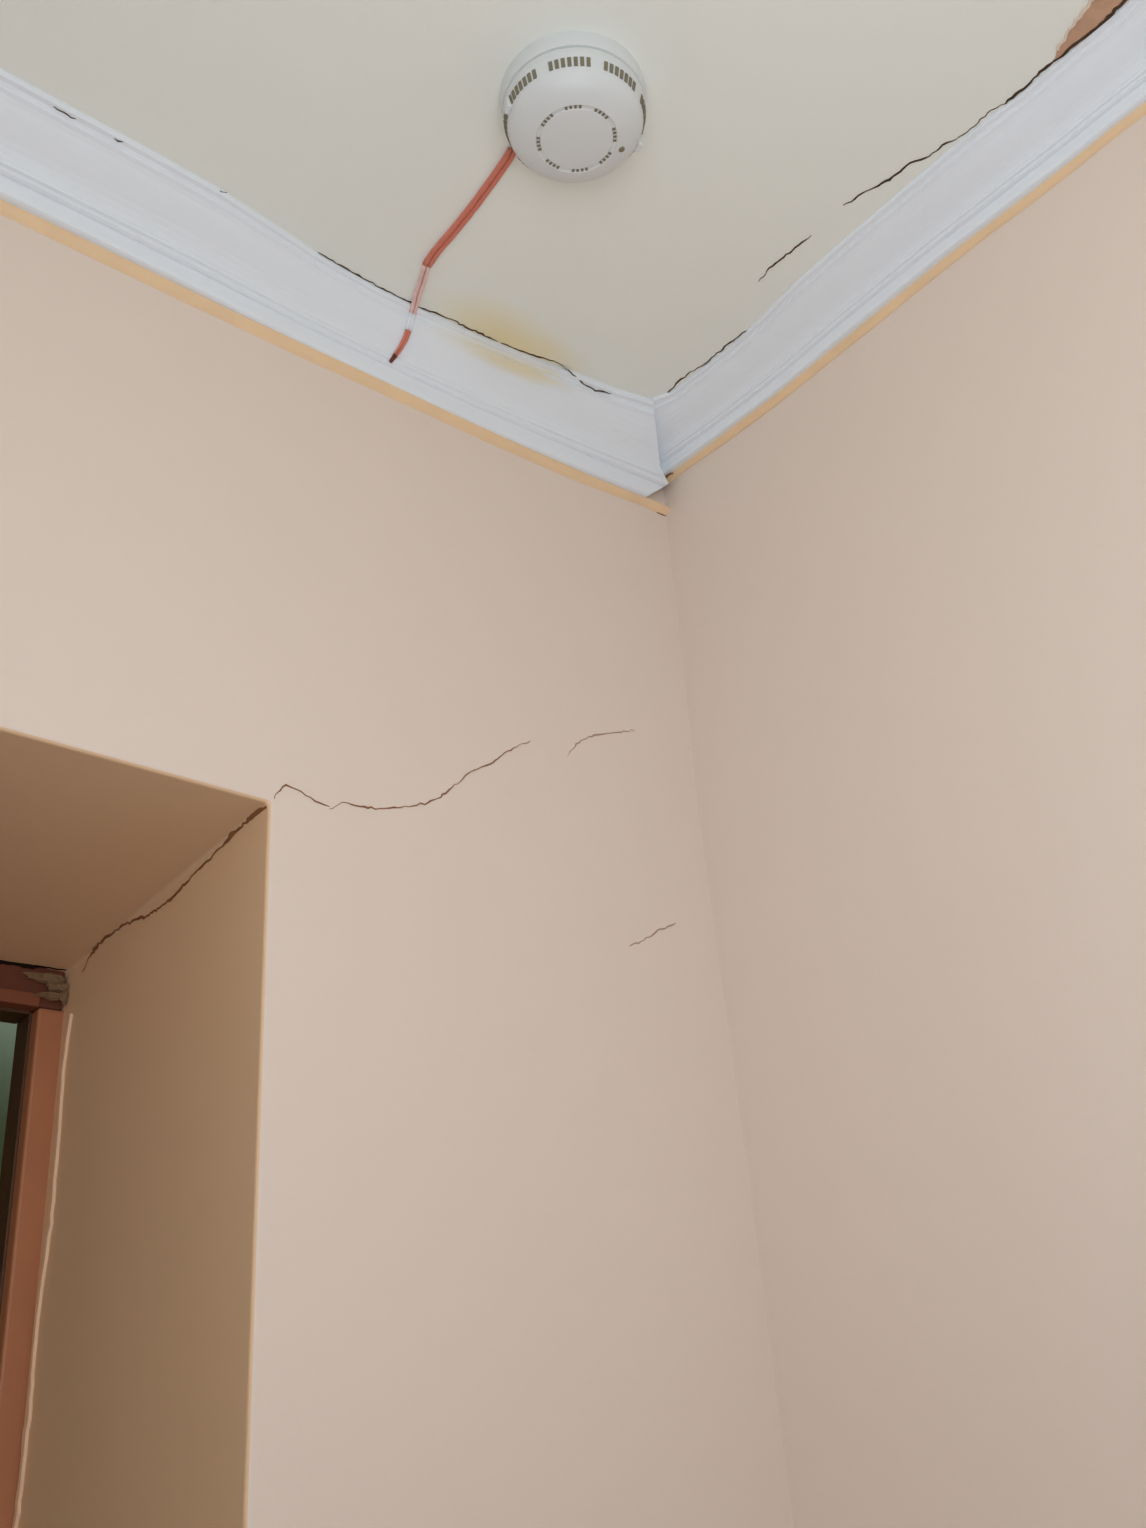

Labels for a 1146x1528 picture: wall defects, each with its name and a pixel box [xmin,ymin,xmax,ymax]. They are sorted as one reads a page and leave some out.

spalling [1053,0,1128,62]
crack [844,61,1054,205]
crack [758,236,811,282]
crack [318,252,611,394]
crack [668,331,746,393]
crack [567,729,634,756]
crack [0,740,531,972]